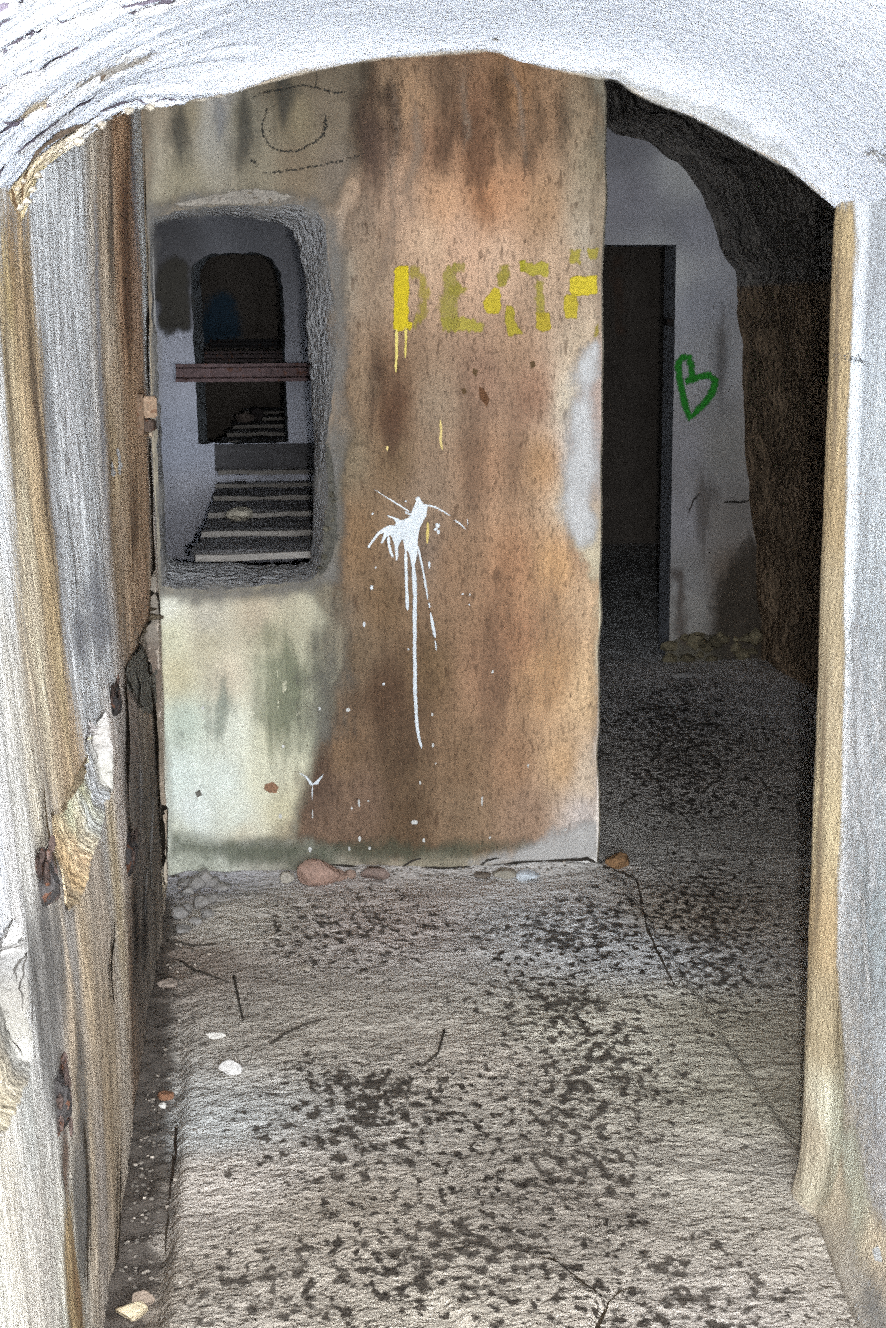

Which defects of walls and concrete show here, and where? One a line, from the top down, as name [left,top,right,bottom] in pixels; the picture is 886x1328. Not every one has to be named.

peeling [0,47,81,99]
spalling [0,62,176,219]
peeling [0,0,191,58]
leakage [43,353,108,664]
leakage [80,222,123,485]
corrosion [297,51,604,856]
spalling [0,921,33,1131]
leakage [31,901,91,1260]
spalling [51,709,114,911]
leakage [128,721,163,1051]
leakage [268,646,301,731]
leakage [174,678,810,1328]